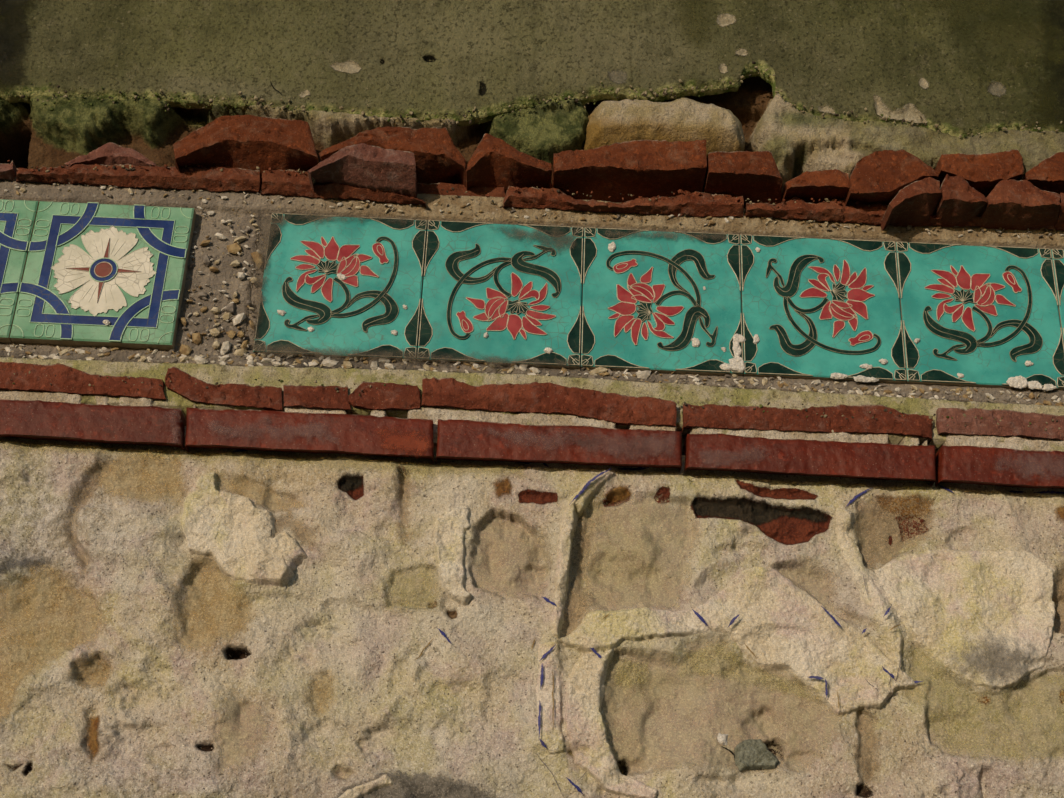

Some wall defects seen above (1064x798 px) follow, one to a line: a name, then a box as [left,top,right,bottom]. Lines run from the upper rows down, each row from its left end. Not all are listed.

spalling [331,60,361,74]
spalling [873,96,927,123]
peeling [518,470,1064,798]